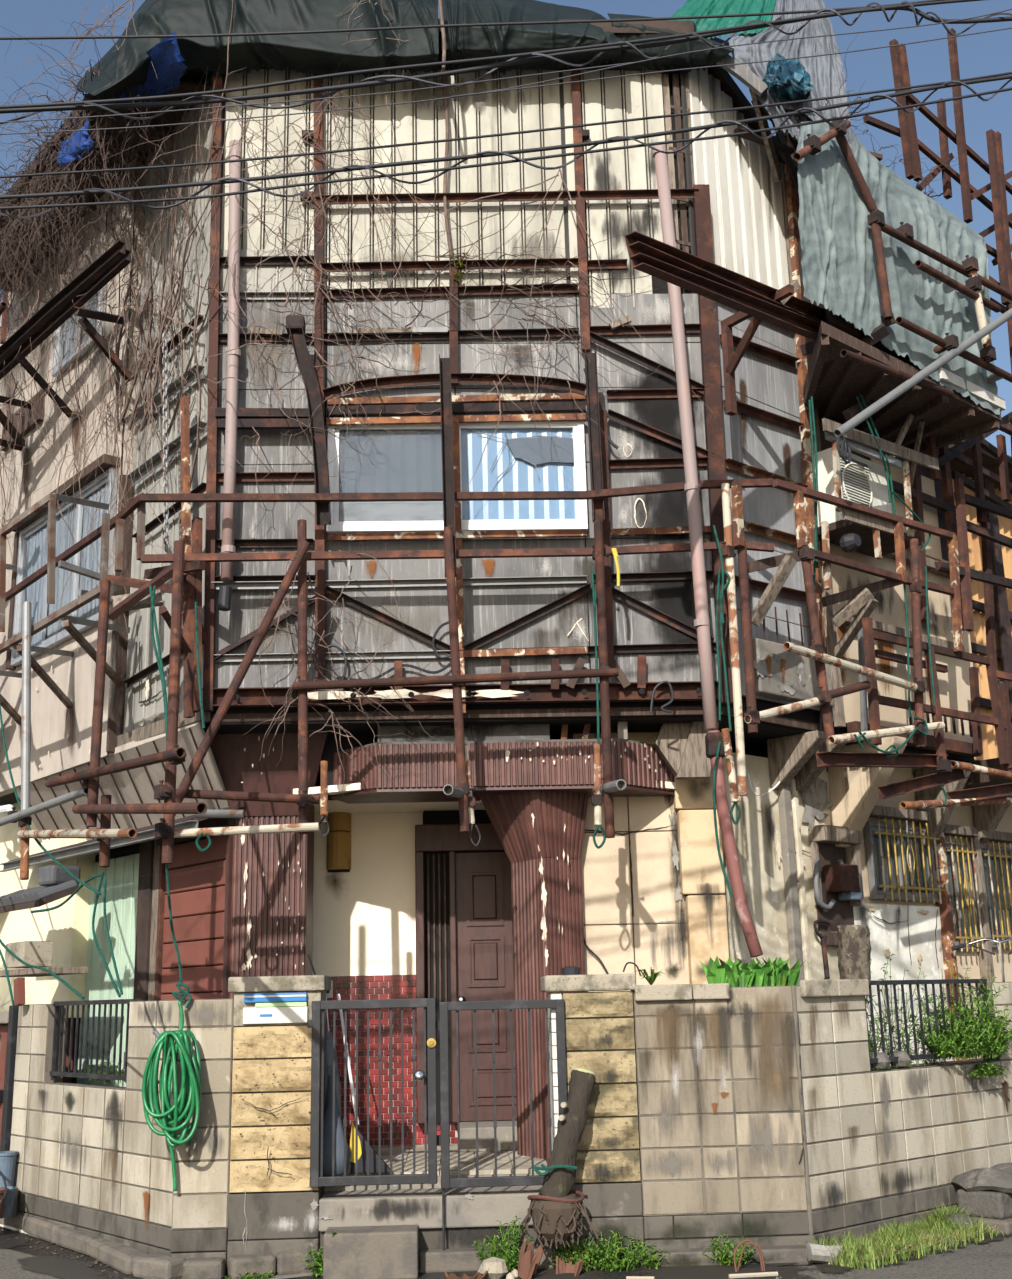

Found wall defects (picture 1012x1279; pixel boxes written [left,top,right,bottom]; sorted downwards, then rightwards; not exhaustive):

water stain [595,157,616,190]
water stain [602,207,657,286]
water stain [765,803,775,841]
peeling [241,864,257,971]
peeling [538,846,569,966]
water stain [700,883,712,924]
water stain [106,1091,122,1184]
water stain [138,1003,170,1023]
water stain [187,1133,222,1155]
water stain [641,1003,793,1093]
water stain [876,1077,891,1157]
water stain [908,1071,927,1094]